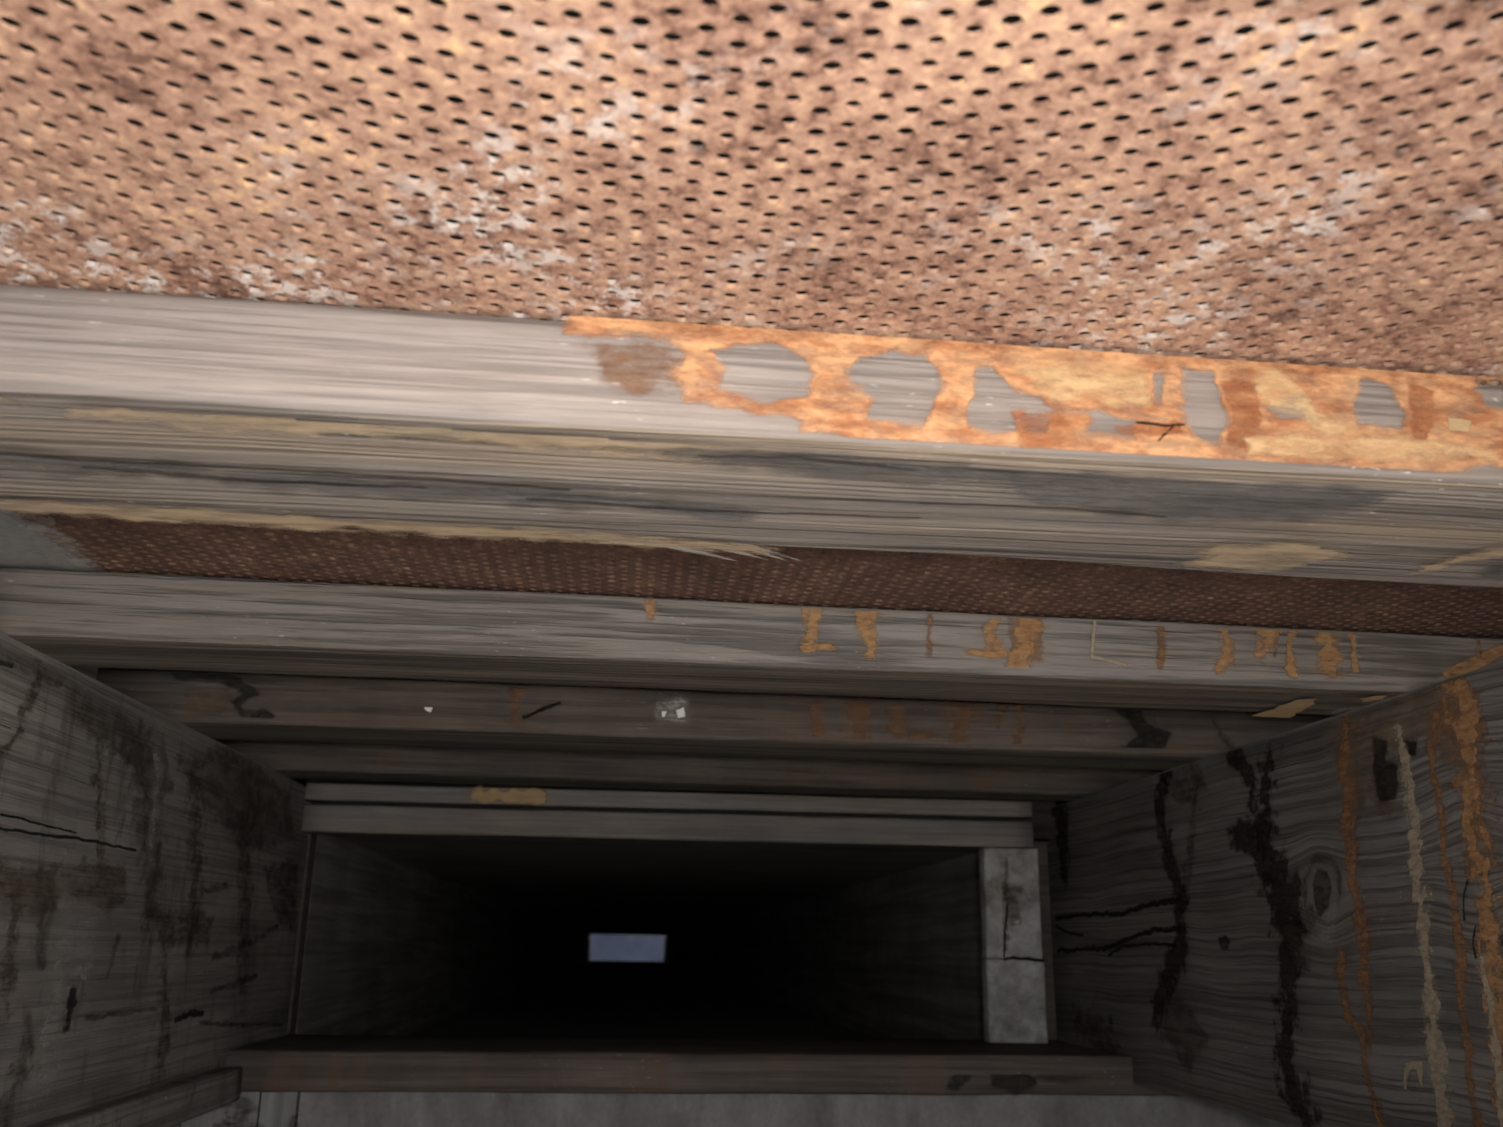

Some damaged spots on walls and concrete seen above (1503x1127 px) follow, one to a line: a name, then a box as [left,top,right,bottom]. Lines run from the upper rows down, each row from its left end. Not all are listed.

rust [565,315,1503,472]
rust [800,608,835,653]
rust [854,611,878,659]
rust [966,617,1045,668]
water stain [174,673,275,719]
water stain [1113,709,1171,749]
crack [0,814,137,851]
water stain [0,702,298,1127]
crack [1003,895,1183,962]
water stain [1150,764,1207,1069]
water stain [1214,722,1322,1127]
rust [1426,639,1503,1127]